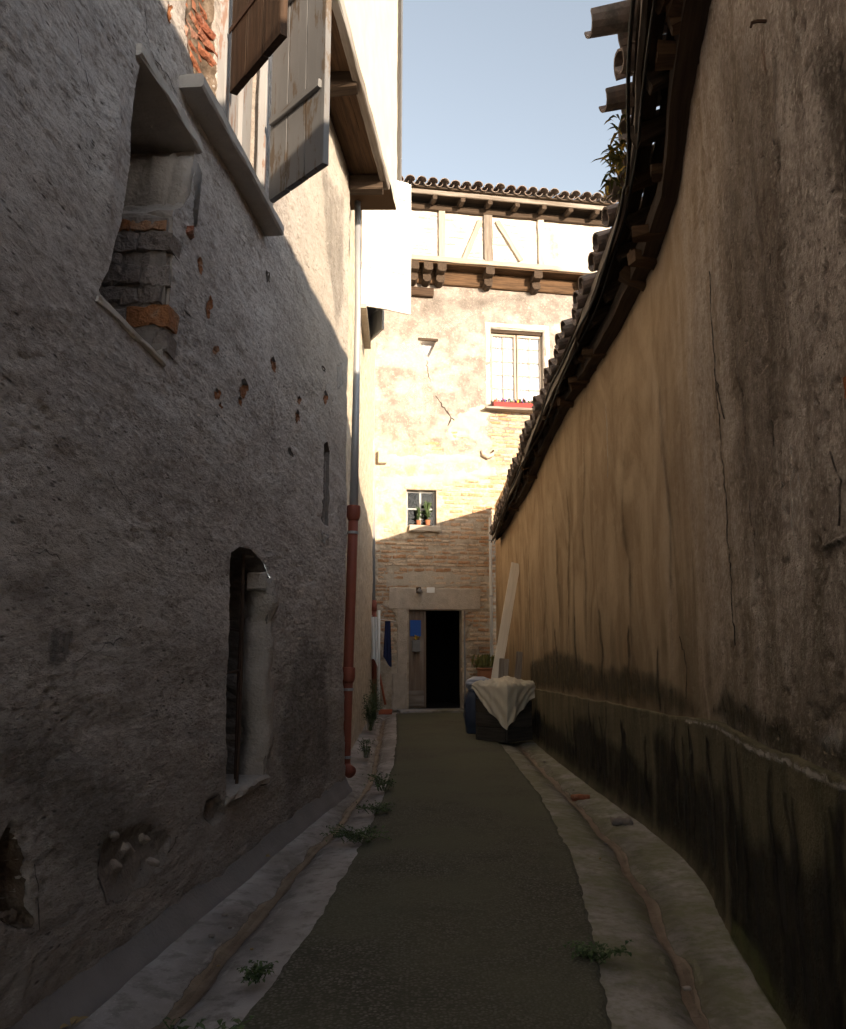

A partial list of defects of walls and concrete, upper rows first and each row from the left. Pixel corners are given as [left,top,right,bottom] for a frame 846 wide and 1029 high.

spalling [167,0,218,97]
spalling [238,378,249,406]
crack [426,361,454,425]
peeling [445,405,491,441]
damp [530,613,821,1000]
spalling [0,828,34,930]